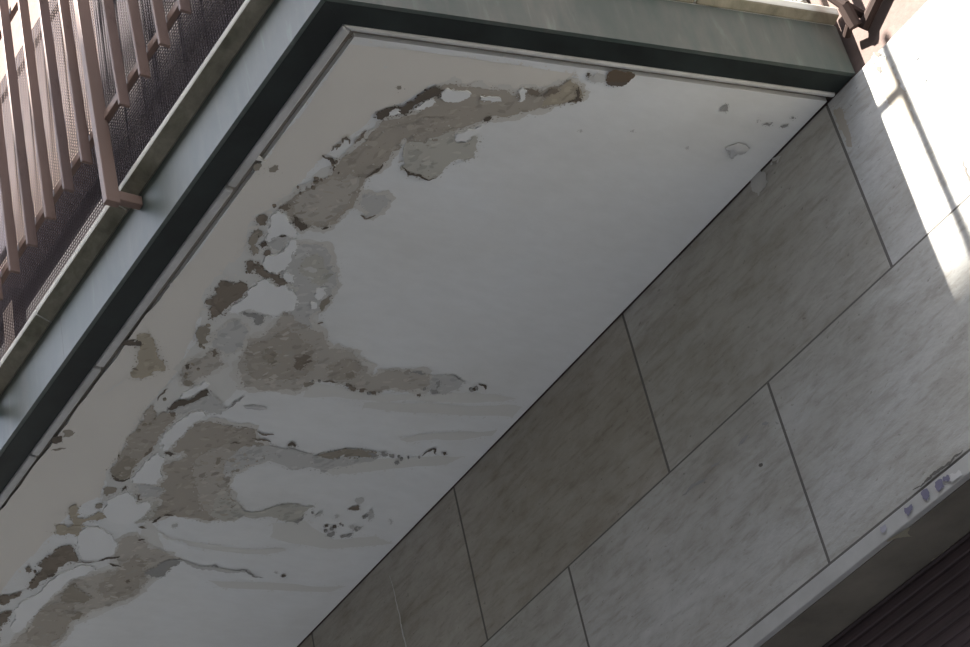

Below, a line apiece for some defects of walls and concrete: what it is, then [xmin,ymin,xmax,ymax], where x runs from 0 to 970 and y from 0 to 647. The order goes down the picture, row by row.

peeling [0,80,582,647]